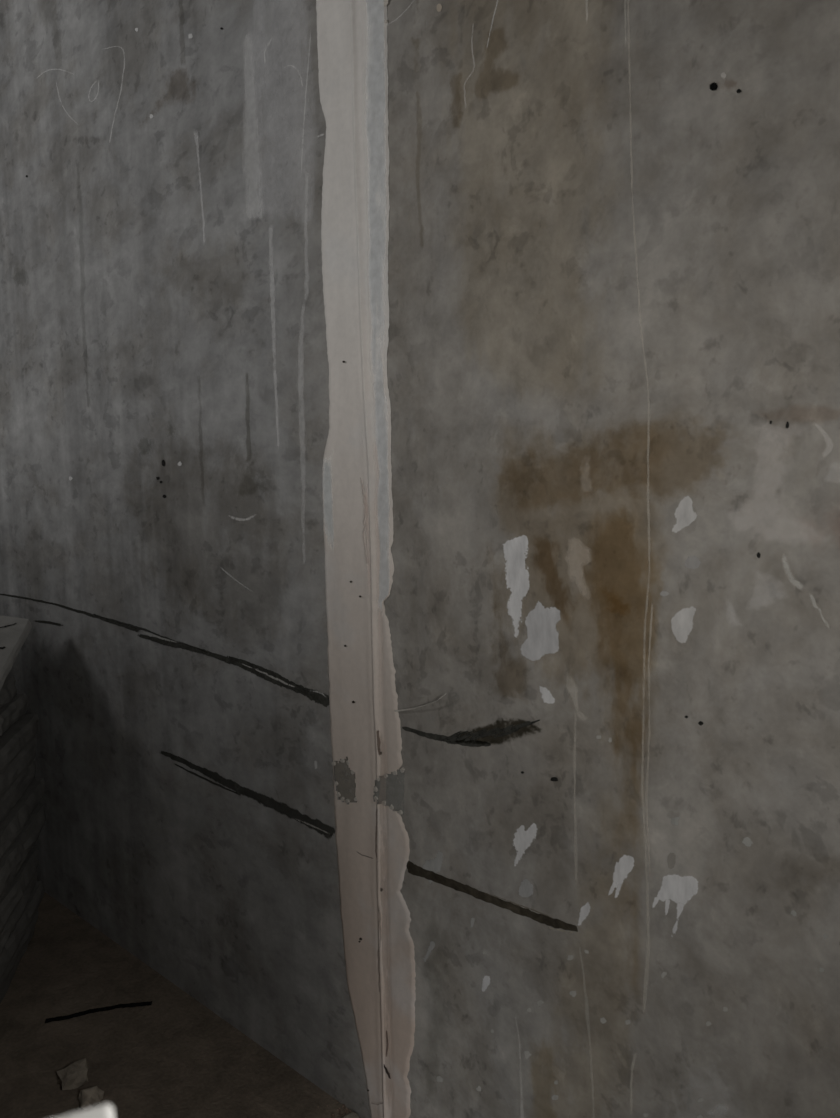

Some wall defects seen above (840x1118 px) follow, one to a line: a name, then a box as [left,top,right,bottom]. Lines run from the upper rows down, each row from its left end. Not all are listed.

crack [0,594,329,707]
crack [374,731,382,755]
crack [161,751,335,838]
spalling [332,757,357,803]
crack [357,809,378,859]
crack [406,861,578,933]
crack [371,1031,391,1105]